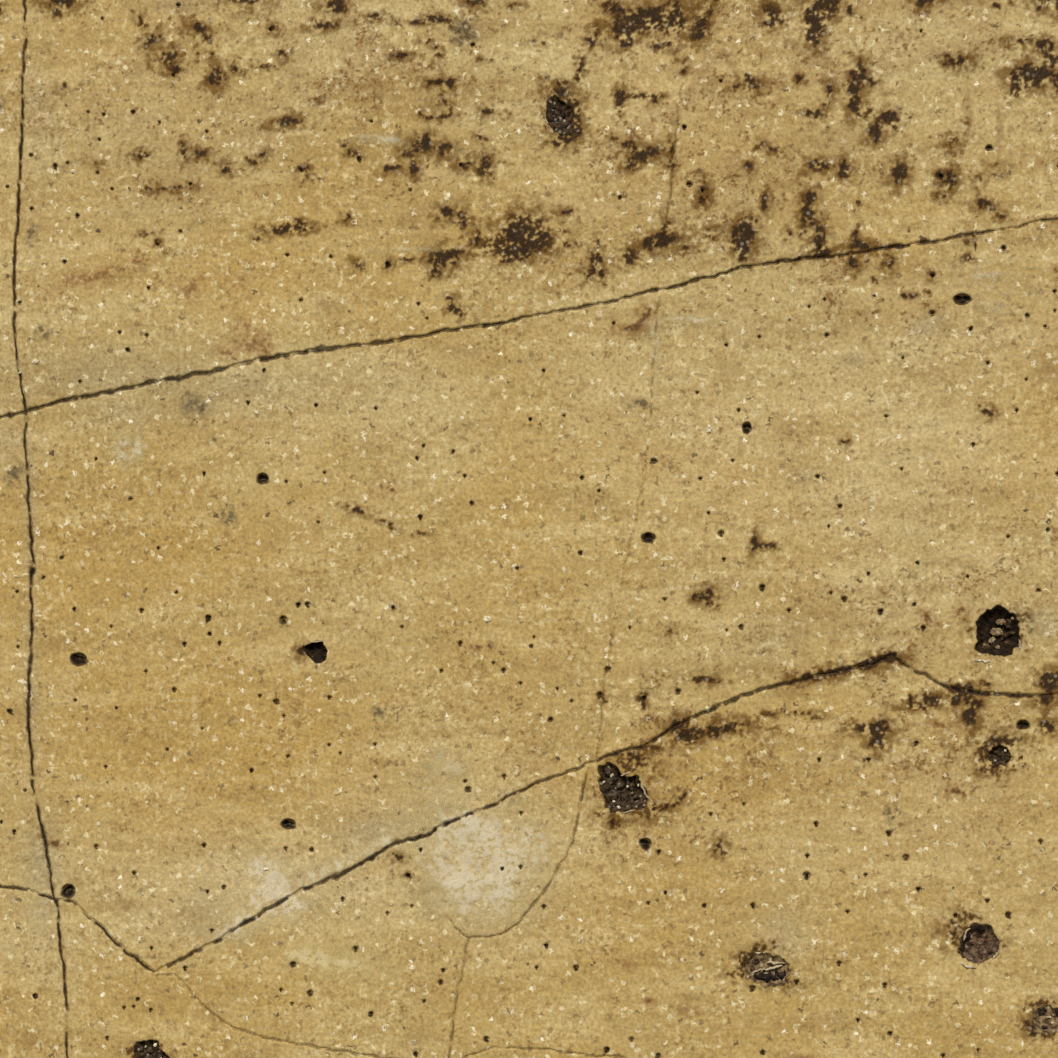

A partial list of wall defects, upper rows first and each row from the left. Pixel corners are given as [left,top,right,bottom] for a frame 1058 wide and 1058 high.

spalling [539,83,586,152]
damp [552,0,719,86]
damp [800,51,913,145]
damp [997,35,1058,98]
damp [384,205,578,280]
crack [244,229,1004,364]
crack [0,38,288,1007]
hole [964,605,1028,663]
damp [841,679,991,761]
hole [593,751,657,822]
crack [303,656,1053,890]
spalling [938,910,1006,969]